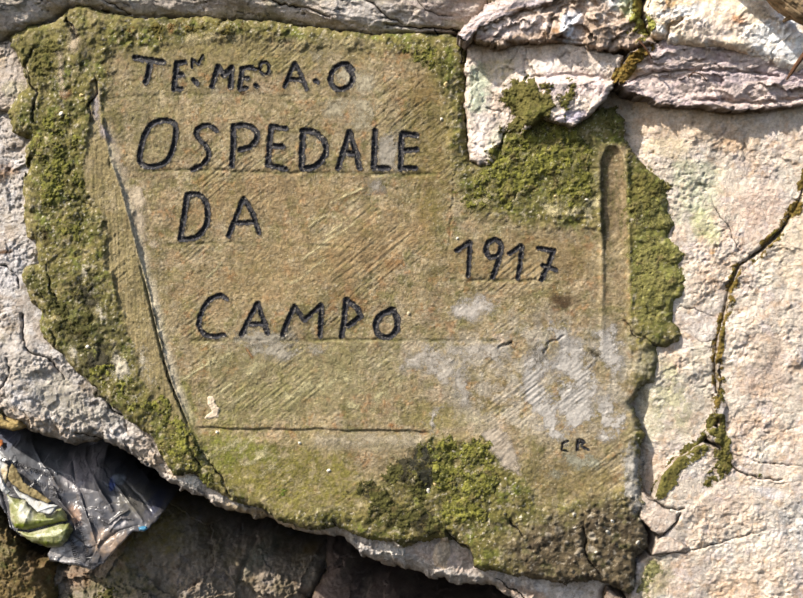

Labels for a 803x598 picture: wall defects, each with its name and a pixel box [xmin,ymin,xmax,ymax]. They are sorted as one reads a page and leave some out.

crack [366,0,467,64]
water stain [451,295,494,321]
water stain [401,344,509,406]
water stain [520,320,626,441]
crack [710,330,722,414]
water stain [316,433,435,489]
water stain [481,427,520,474]
water stain [565,452,599,470]